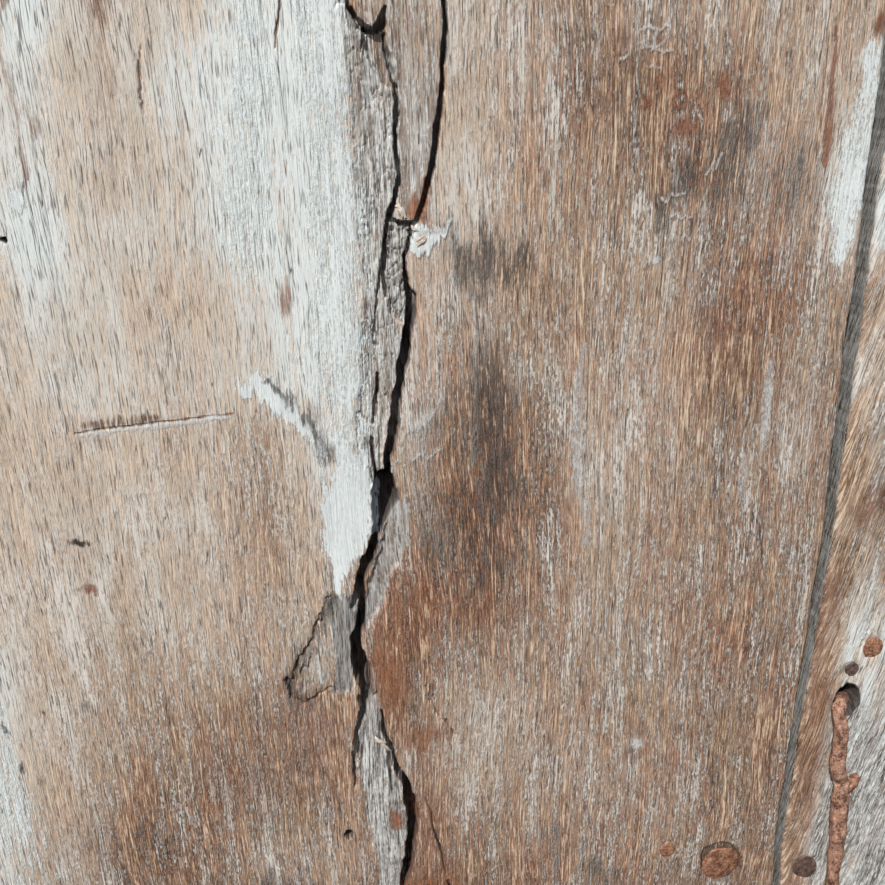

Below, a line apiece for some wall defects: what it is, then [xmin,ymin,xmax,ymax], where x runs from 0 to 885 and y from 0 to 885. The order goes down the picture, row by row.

crack [274,0,282,47]
crack [285,0,451,885]
crack [424,660,458,734]